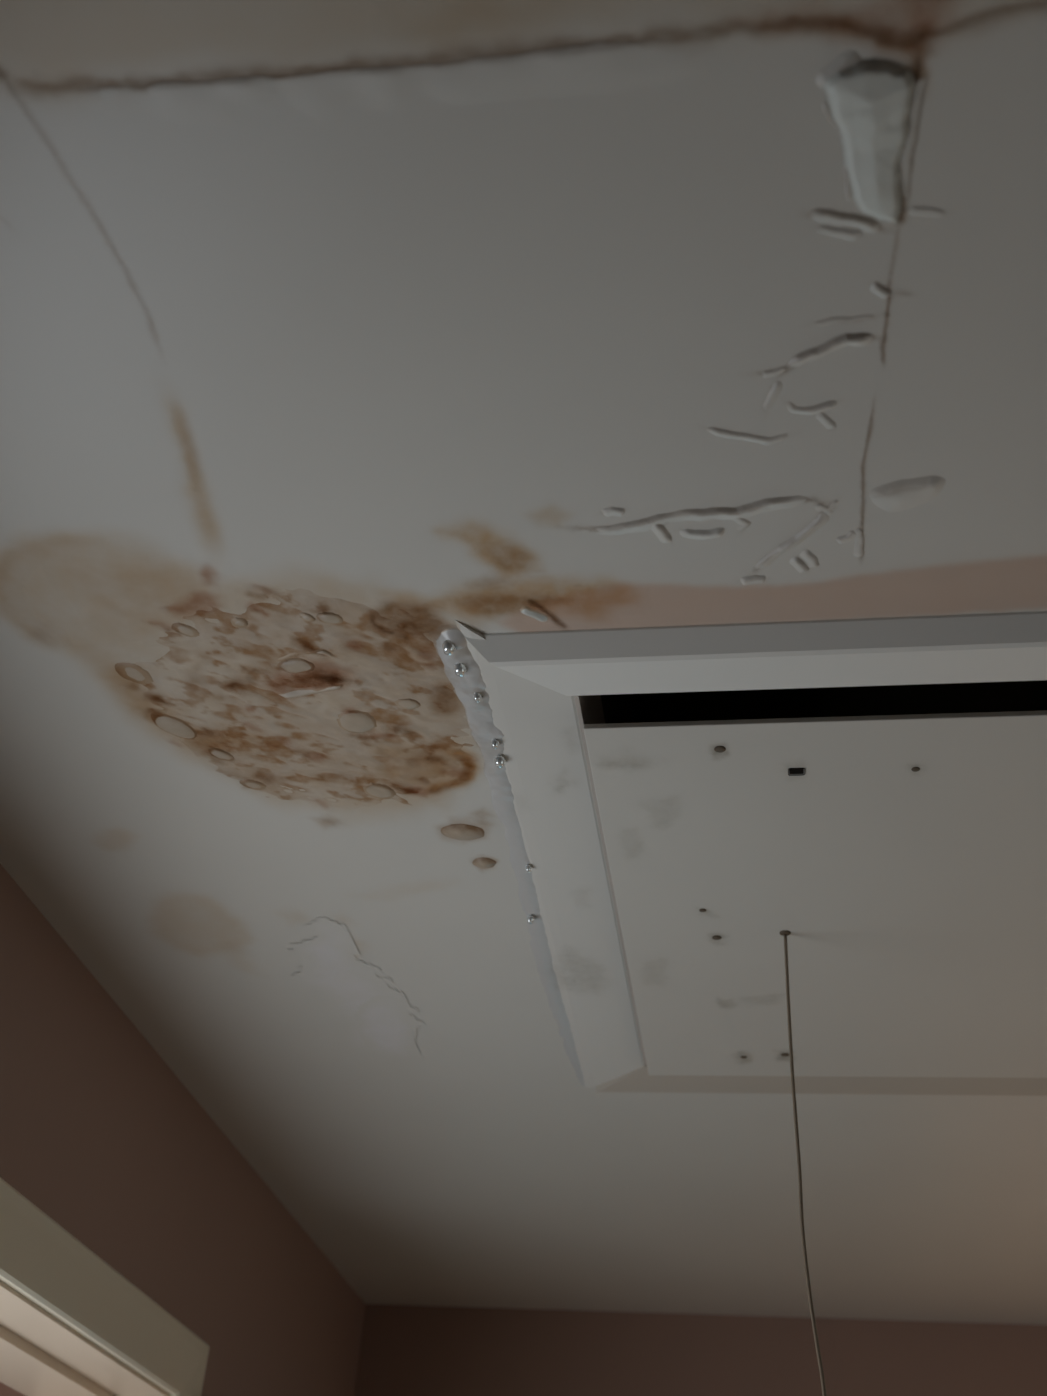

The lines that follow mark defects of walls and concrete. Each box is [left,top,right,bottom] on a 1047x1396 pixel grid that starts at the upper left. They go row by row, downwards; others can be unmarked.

crack [76,36,720,126]
peeling [815,50,916,224]
crack [900,73,928,204]
leakage [115,588,585,1086]